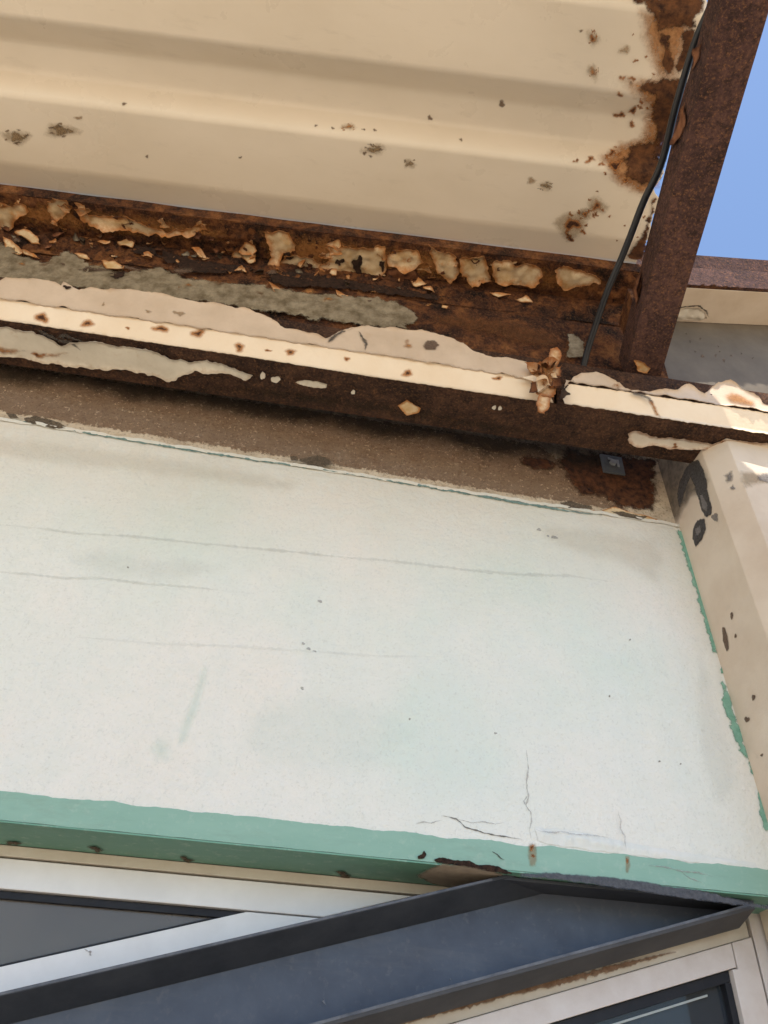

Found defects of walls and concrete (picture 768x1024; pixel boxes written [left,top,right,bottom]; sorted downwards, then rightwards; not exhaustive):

corrosion [0,0,704,326]
peeling [0,198,768,546]
corrosion [0,313,768,511]
leakage [658,459,696,519]
crack [445,816,511,860]